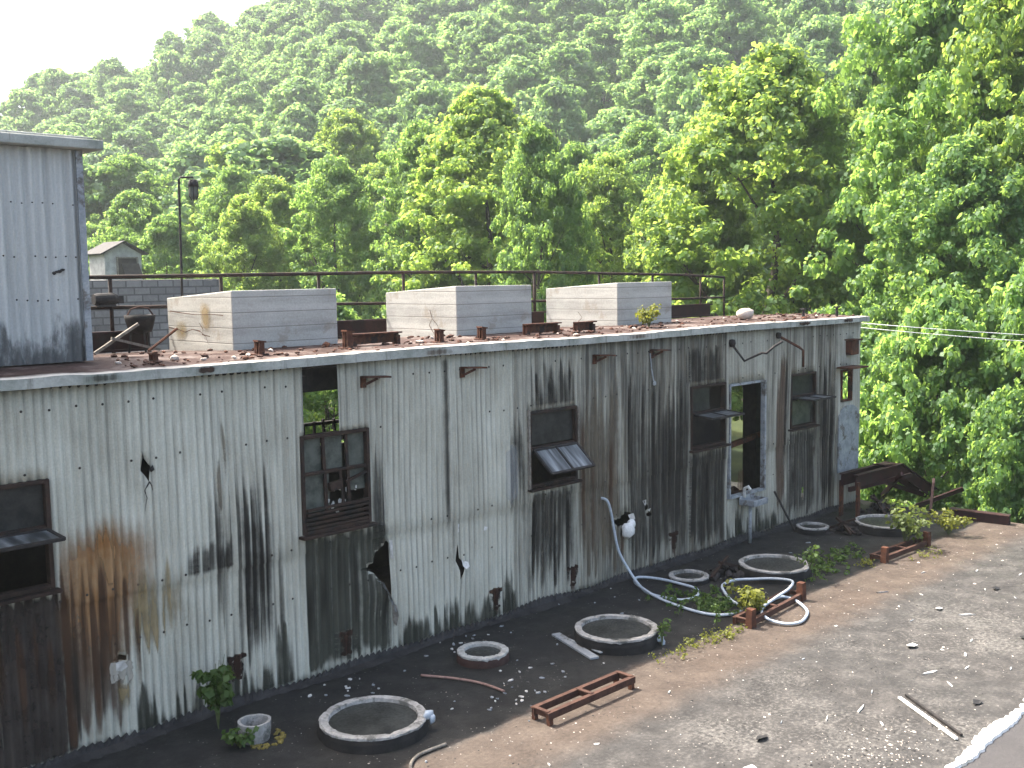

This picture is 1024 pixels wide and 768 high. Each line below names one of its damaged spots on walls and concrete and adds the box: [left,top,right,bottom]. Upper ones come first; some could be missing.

corrosion [60,527,172,748]
corrosion [227,653,247,684]
water stain [215,431,292,685]
corrosion [489,587,502,614]
water stain [511,433,525,503]
water stain [532,377,725,586]
water stain [755,356,835,532]